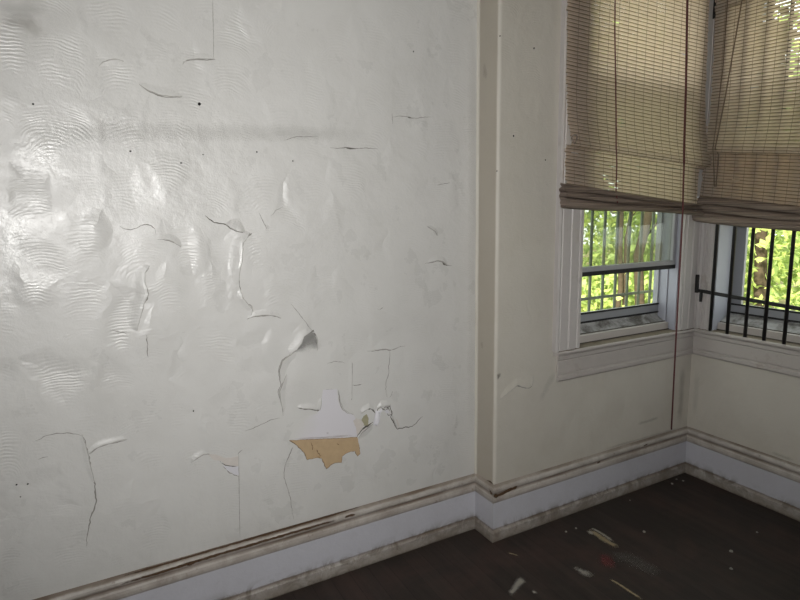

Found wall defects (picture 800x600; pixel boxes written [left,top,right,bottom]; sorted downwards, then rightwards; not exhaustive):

crack [183,27,216,64]
crack [139,83,182,98]
crack [287,136,377,149]
crack [121,224,182,247]
crack [206,207,311,329]
crack [372,340,423,430]
peeling [289,389,383,469]
crack [36,433,127,546]